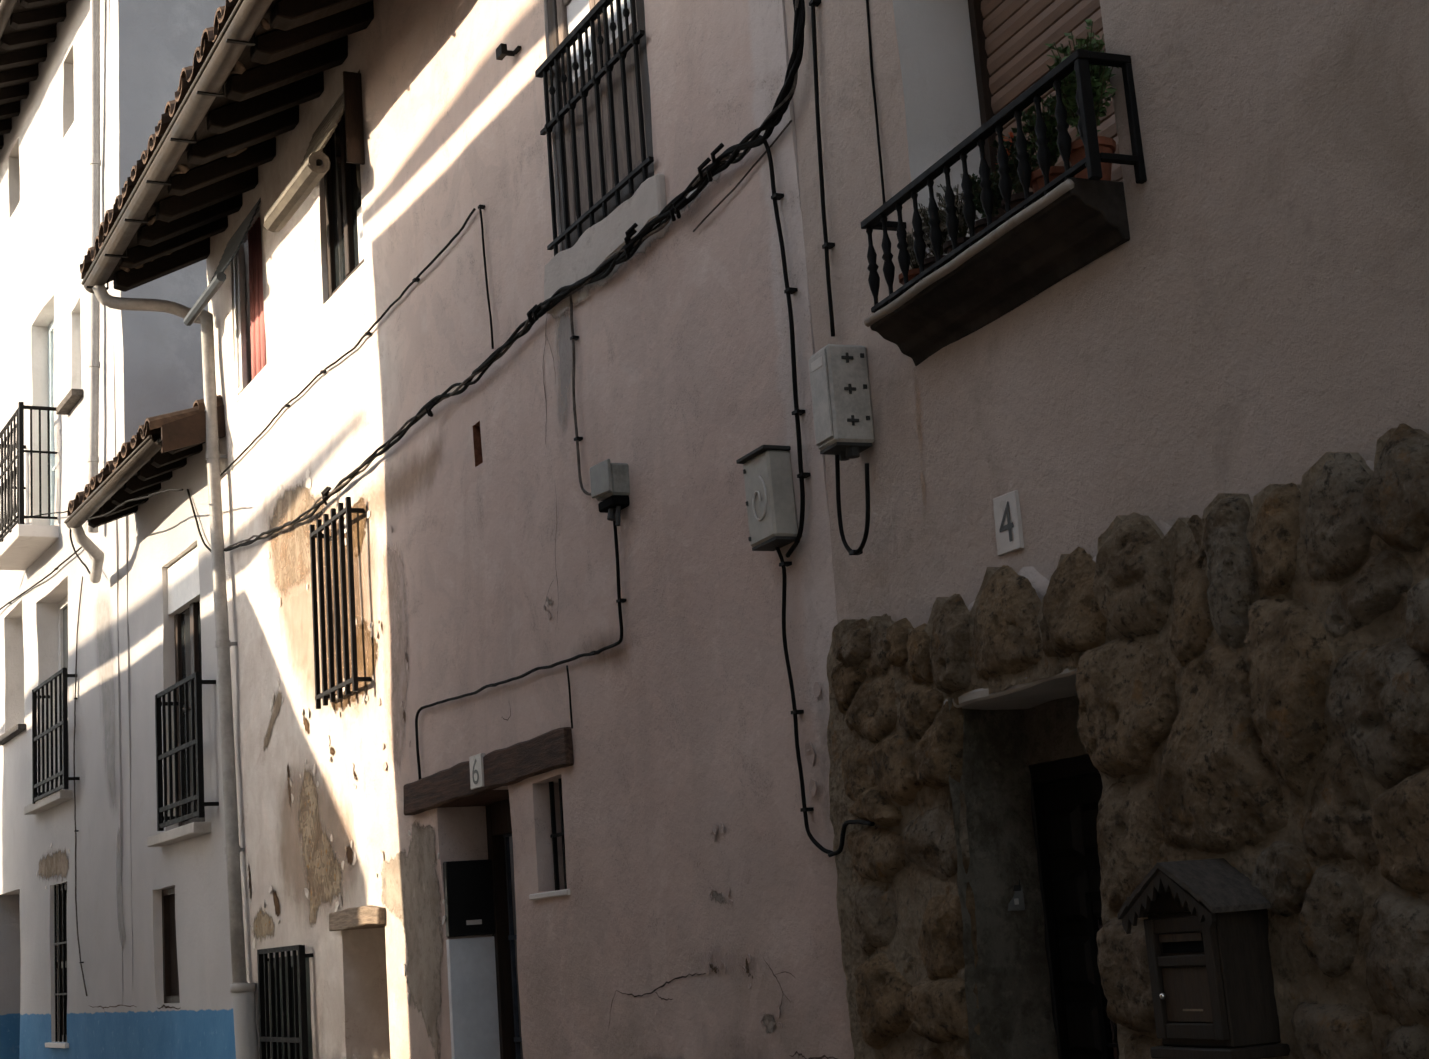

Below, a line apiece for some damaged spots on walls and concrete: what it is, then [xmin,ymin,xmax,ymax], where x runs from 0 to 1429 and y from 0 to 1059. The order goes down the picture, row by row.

peeling [268,468,323,606]
flaking render [344,494,371,560]
peeling [263,679,284,750]
peeling [287,708,357,926]
peeling [36,843,70,889]
peeling [246,865,280,949]
peeling [375,822,446,1059]
crack [609,973,706,1023]
crack [789,1051,837,1059]